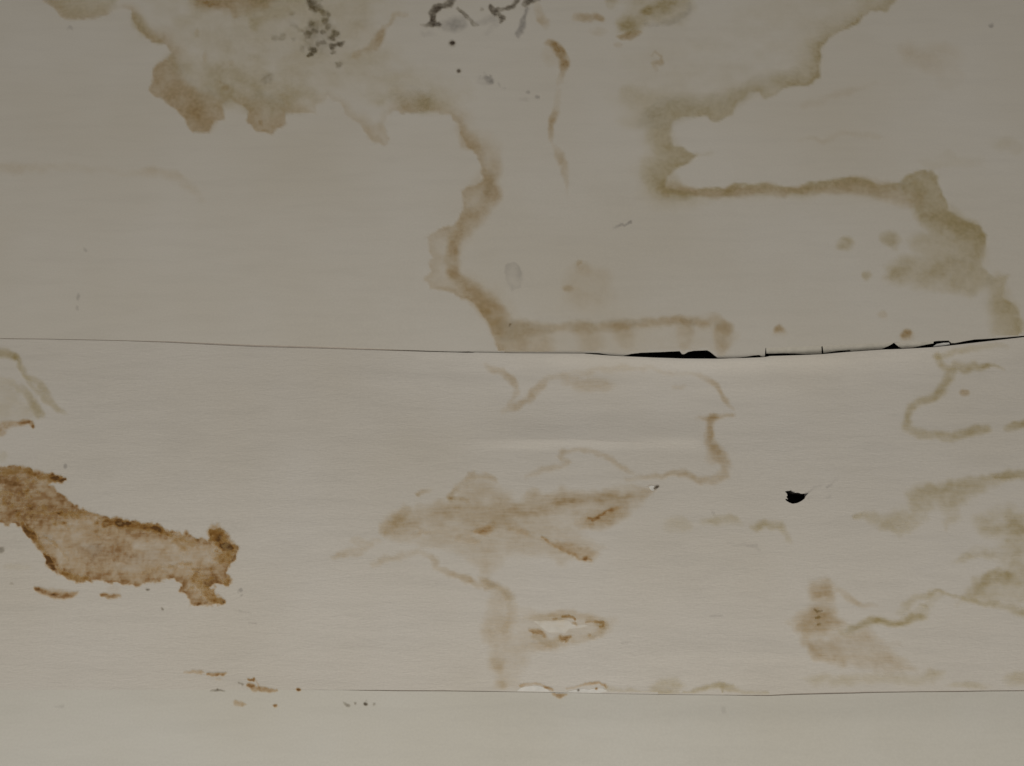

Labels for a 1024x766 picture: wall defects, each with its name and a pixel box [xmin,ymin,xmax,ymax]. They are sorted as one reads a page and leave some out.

damp [429,0,453,26]
damp [489,0,533,21]
crack [55,339,474,353]
crack [586,336,1024,359]